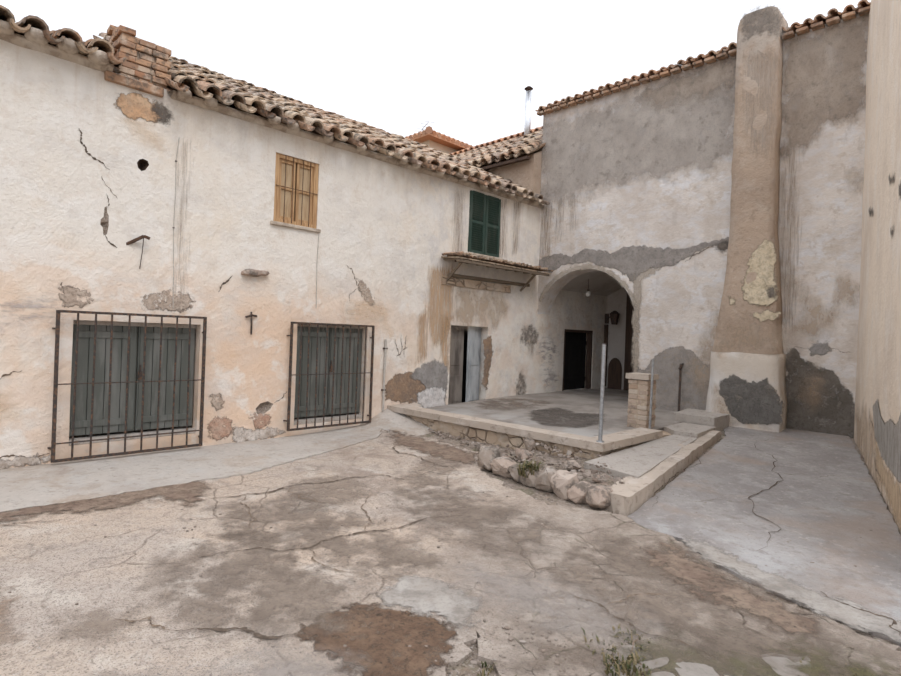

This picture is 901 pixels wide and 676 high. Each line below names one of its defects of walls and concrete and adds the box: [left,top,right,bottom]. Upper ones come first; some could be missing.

flaking render [115,92,159,123]
crack [79,129,117,197]
spalling [685,241,729,262]
flaking render [58,283,93,308]
flaking render [142,290,196,313]
flaking render [728,240,781,323]
spalling [385,360,448,408]
flaking render [207,393,286,442]
flaking render [869,401,901,530]
crack [687,440,834,551]